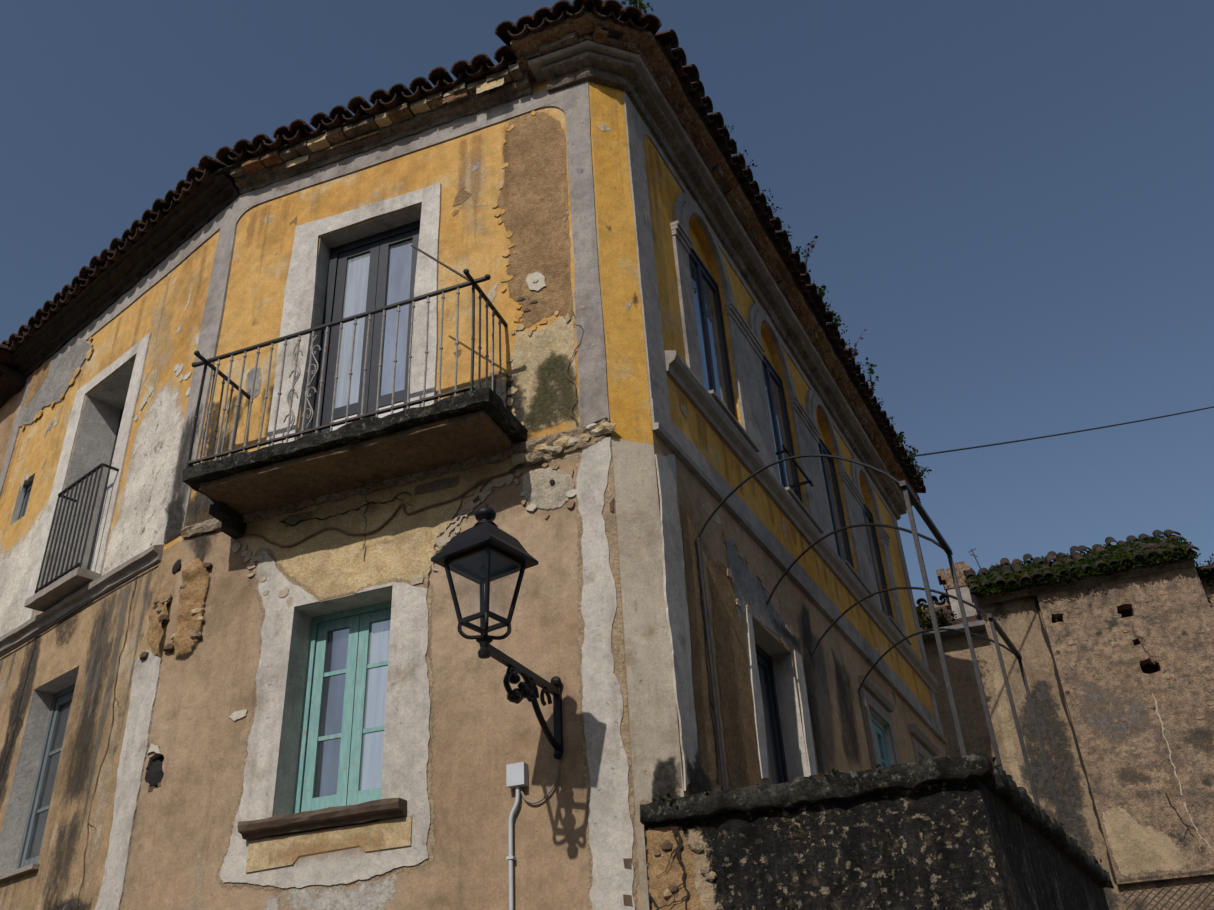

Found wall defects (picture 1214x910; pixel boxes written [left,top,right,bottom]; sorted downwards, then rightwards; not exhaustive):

flaking render [230,110,617,608]
peeling [102,363,192,576]
crack [279,492,413,561]
crack [427,479,495,587]
water stain [0,634,40,800]
water stain [43,574,150,910]
water stain [774,605,859,772]
water stain [1019,681,1096,859]